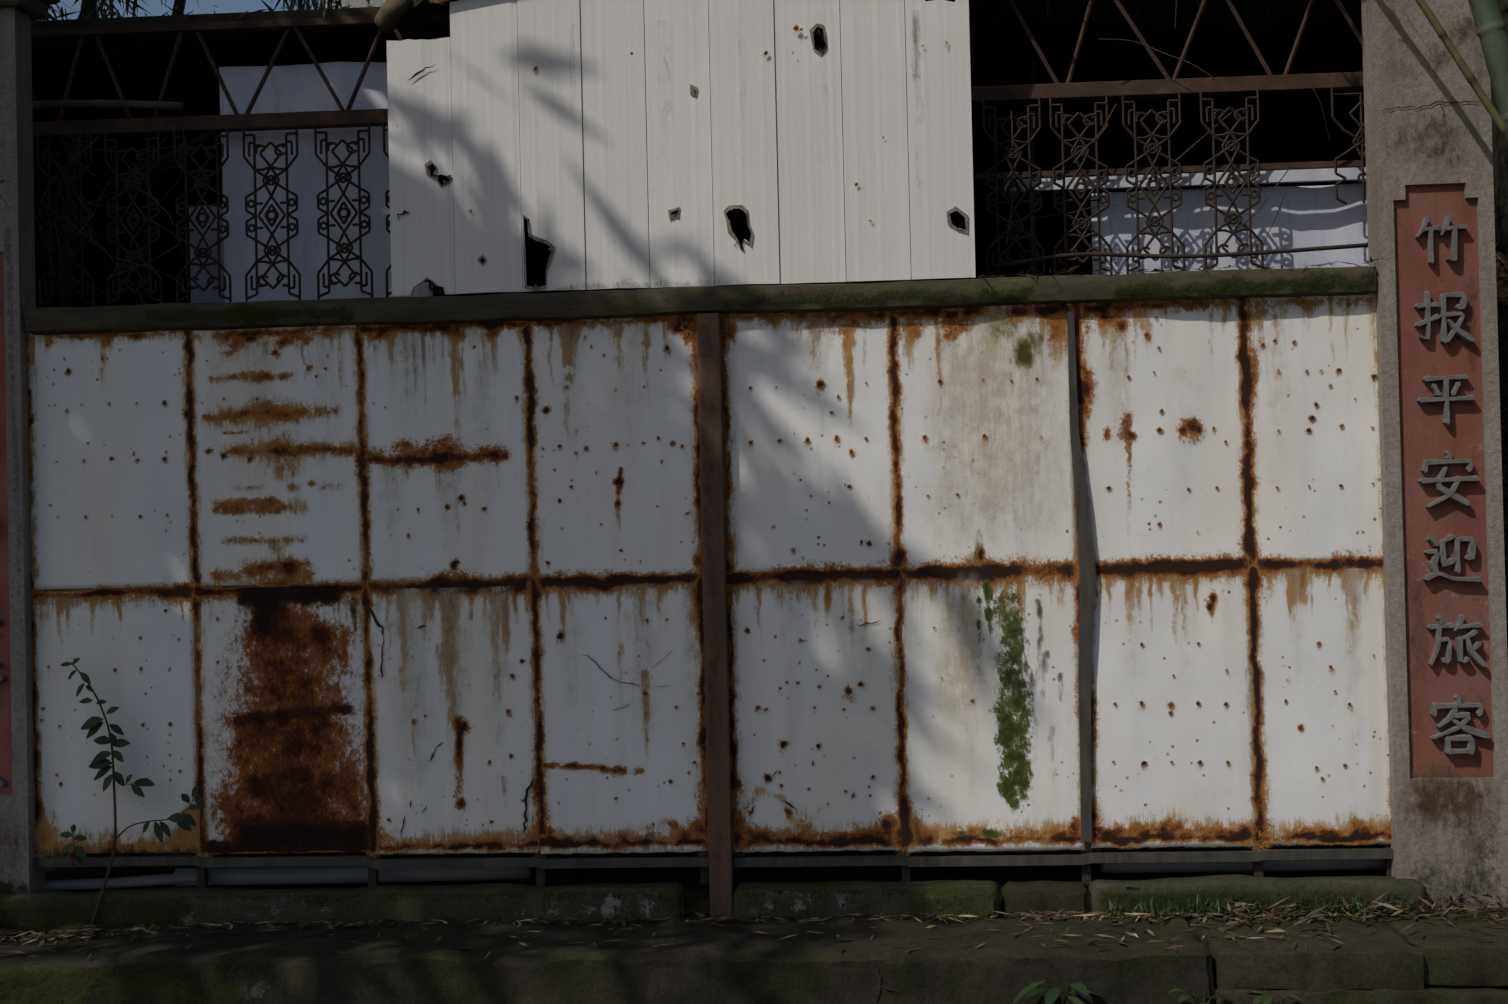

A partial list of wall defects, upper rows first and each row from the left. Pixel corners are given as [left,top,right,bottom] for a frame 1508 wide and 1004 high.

rust [26,314,709,858]